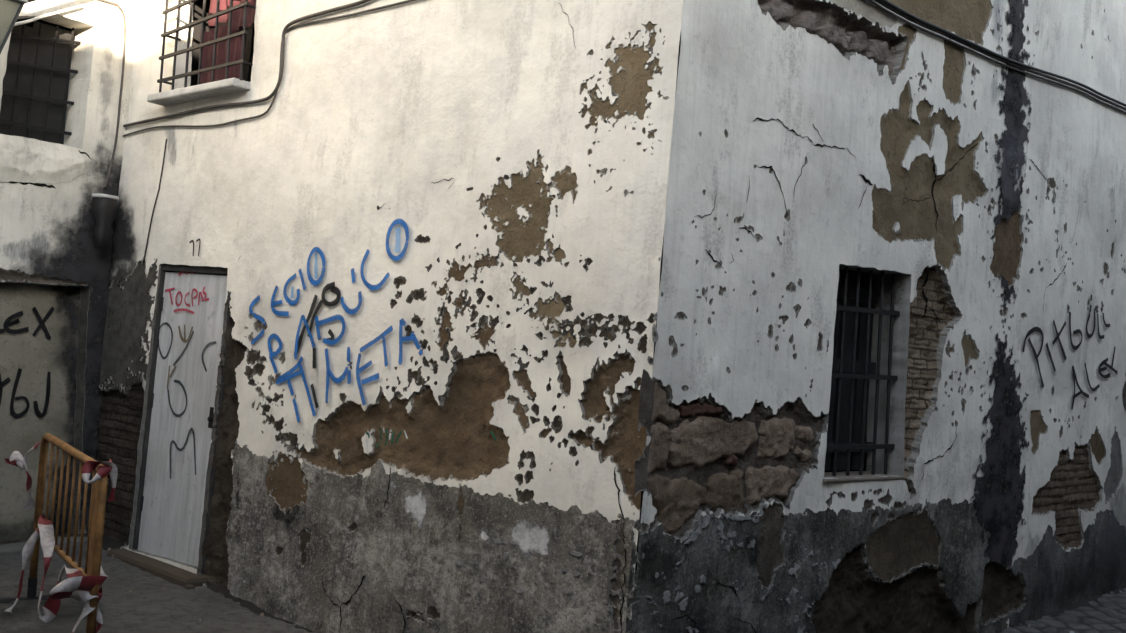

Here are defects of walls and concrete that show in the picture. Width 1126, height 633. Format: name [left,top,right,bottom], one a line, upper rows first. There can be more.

crack [747,117,873,210]
water stain [992,0,1032,239]
spalling [0,268,87,286]
spalling [197,0,1077,633]
water stain [993,275,1017,317]
spalling [1067,219,1126,313]
water stain [972,326,1029,575]
spalling [1022,386,1123,550]